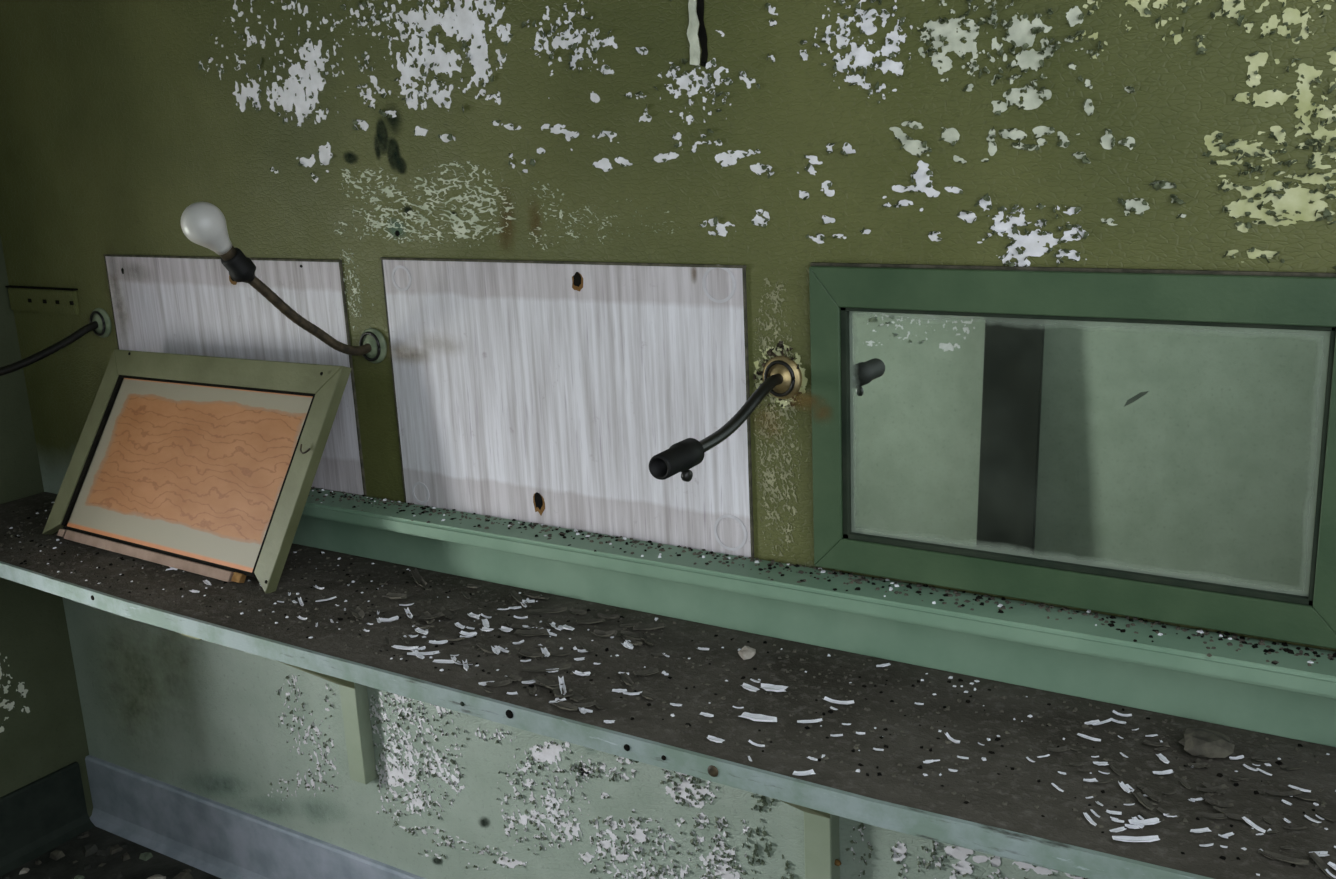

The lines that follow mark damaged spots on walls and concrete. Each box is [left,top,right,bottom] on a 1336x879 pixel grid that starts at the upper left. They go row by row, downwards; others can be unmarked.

peeling [296,142,333,183]
peeling [198,0,618,131]
peeling [541,124,633,172]
peeling [624,58,774,178]
peeling [797,0,1108,211]
peeling [1119,0,1336,233]
peeling [699,217,735,237]
peeling [805,215,871,244]
peeling [957,193,1089,267]
peeling [369,691,794,879]
peeling [890,840,1088,879]
peeling [1188,755,1336,879]